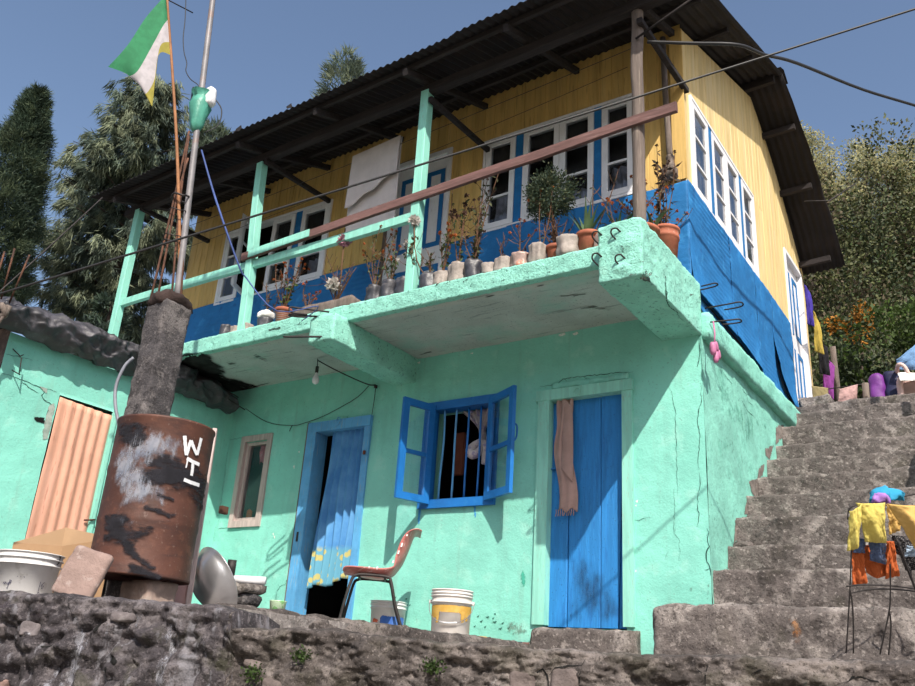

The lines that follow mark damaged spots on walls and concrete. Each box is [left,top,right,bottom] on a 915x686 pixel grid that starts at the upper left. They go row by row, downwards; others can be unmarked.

crack [3,354,53,415]
crack [665,386,711,576]
peeling [733,425,784,547]